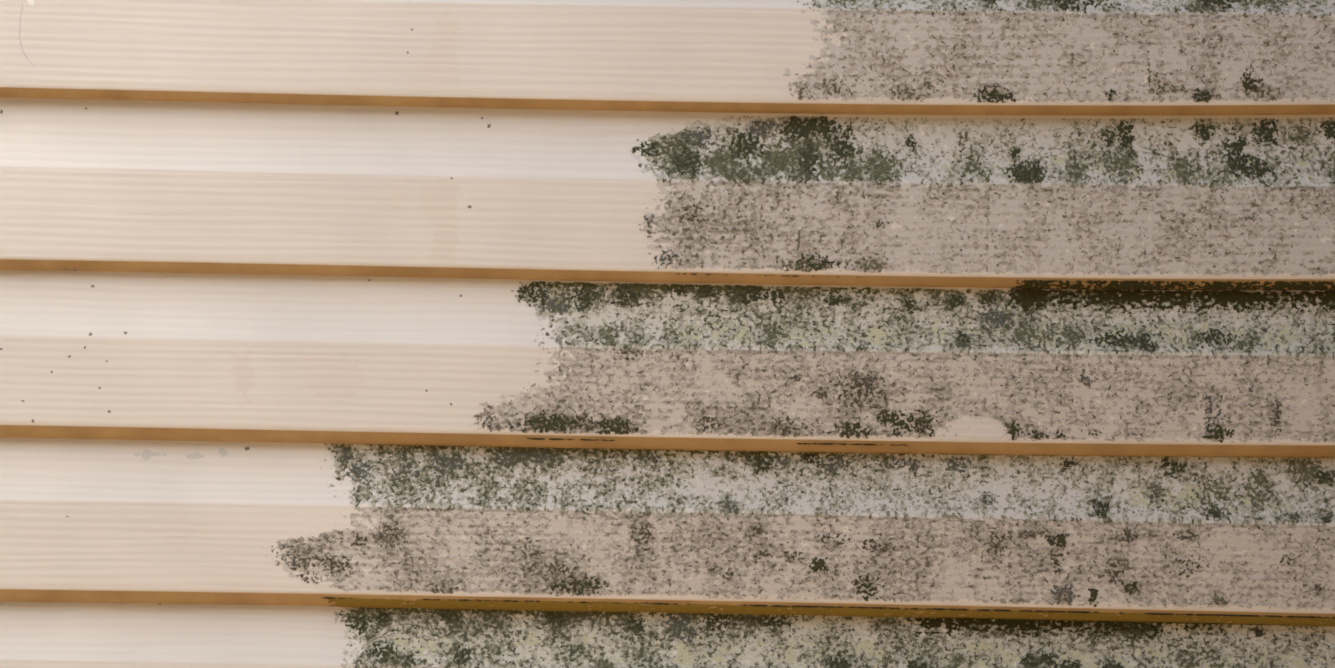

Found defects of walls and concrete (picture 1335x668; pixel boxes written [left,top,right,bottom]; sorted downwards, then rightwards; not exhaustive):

damp [783,0,1335,103]
damp [261,116,1335,668]